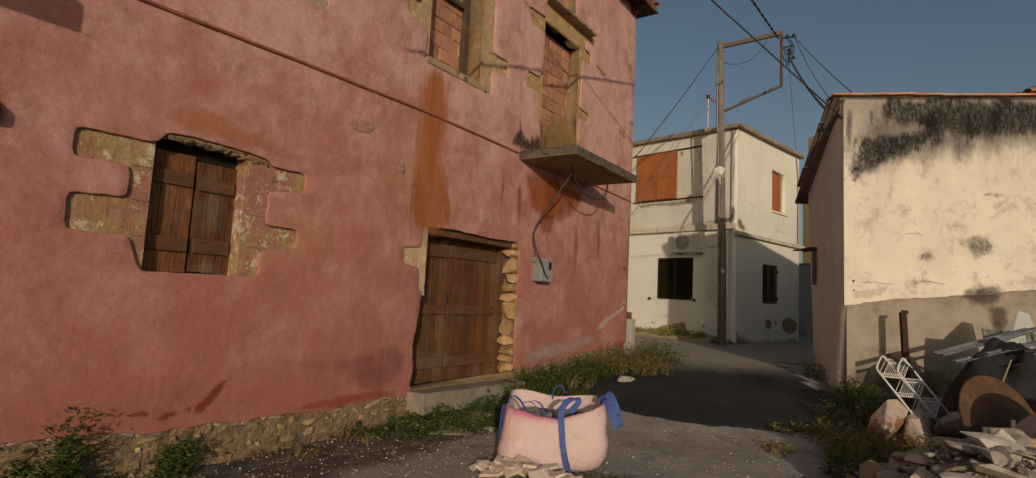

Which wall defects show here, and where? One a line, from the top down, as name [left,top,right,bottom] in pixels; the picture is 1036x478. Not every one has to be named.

corrosion [415,74,448,229]
water stain [847,97,1036,180]
corrosion [528,178,580,231]
water stain [969,238,991,253]